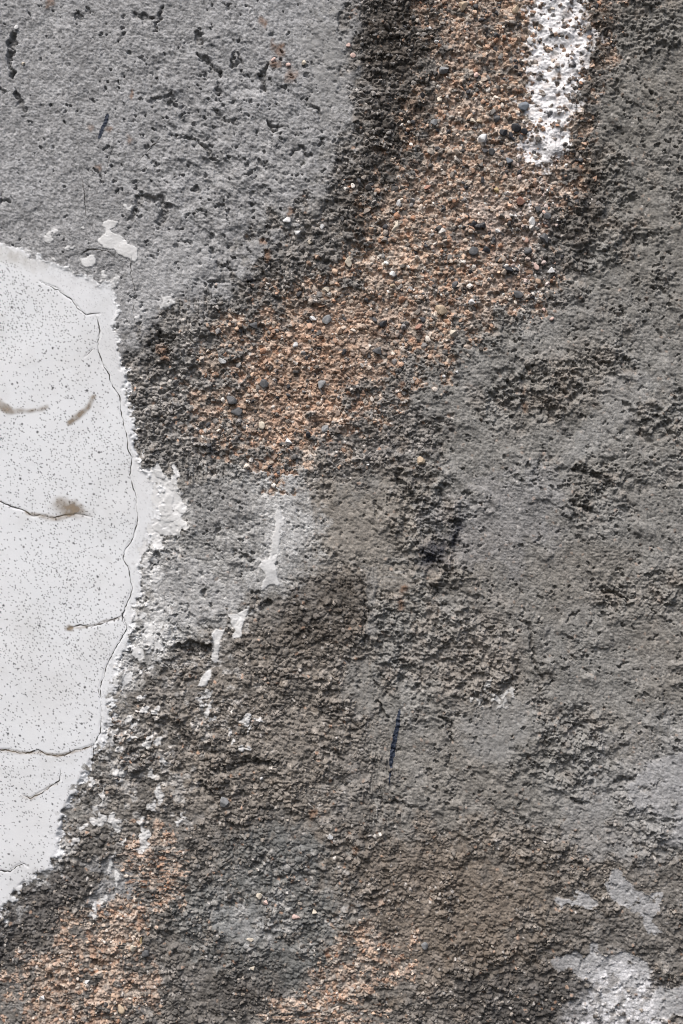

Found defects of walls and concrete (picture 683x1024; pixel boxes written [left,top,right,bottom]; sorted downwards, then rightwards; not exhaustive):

peeling [64,220,138,289]
crack [81,248,143,323]
spalling [121,0,630,590]
crack [0,285,138,799]
peeling [196,606,250,722]
peeling [470,678,515,709]
peeling [228,714,263,752]
spalling [613,775,637,785]
peeling [554,890,598,910]
peeling [605,869,663,936]
spalling [256,899,423,1024]
peeling [551,941,683,1024]